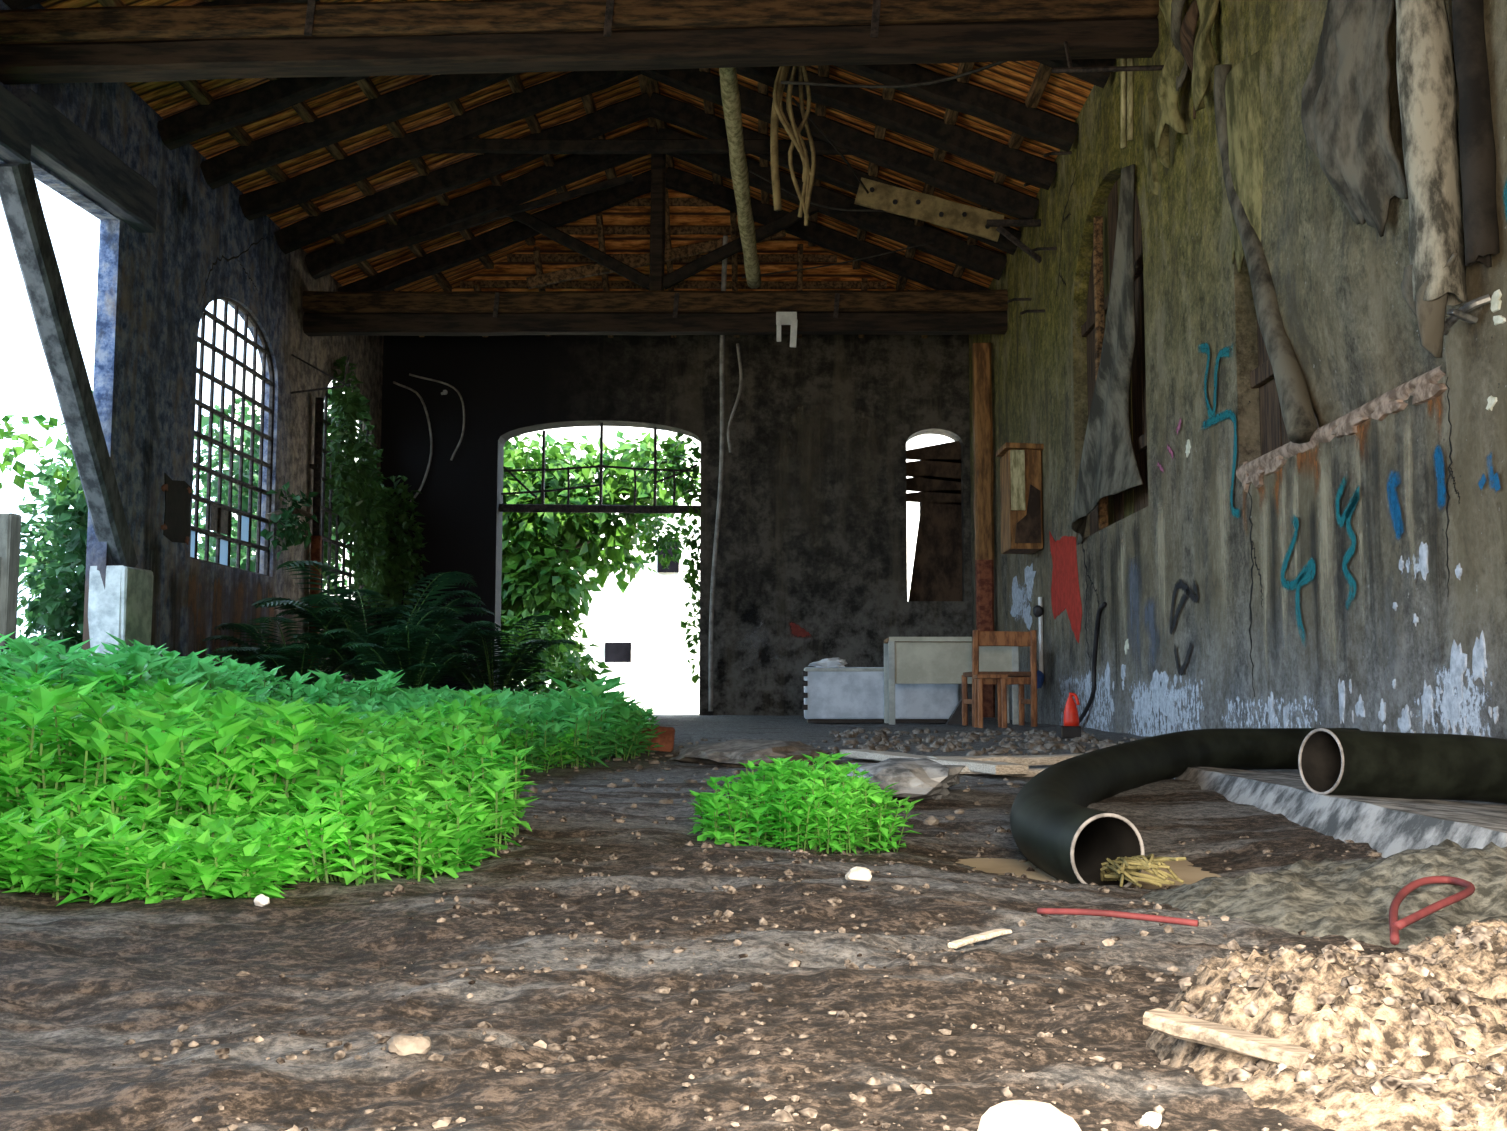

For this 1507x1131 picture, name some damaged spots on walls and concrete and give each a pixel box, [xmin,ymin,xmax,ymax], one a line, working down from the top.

spalling [1490,289,1506,325]
peeling [1399,542,1429,581]
peeling [1058,630,1499,736]